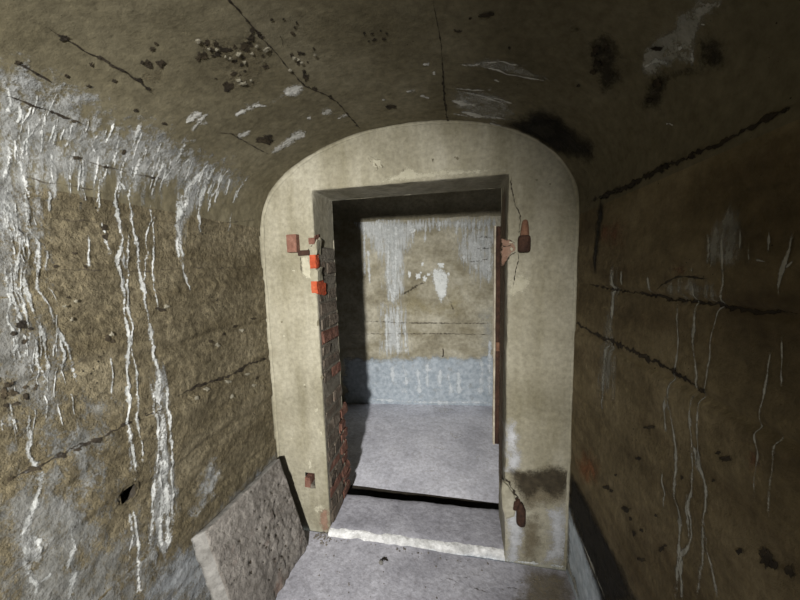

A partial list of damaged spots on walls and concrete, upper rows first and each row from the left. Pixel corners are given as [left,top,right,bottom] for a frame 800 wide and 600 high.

crack [51,30,165,90]
spalling [195,28,270,92]
spalling [288,47,317,91]
hole [256,134,273,145]
crack [602,107,790,198]
flaking render [292,257,311,279]
damp [0,63,246,600]
damp [343,217,496,411]
crack [576,322,704,393]
efflorescence [661,209,765,597]
crack [7,408,164,481]
damp [507,426,636,600]